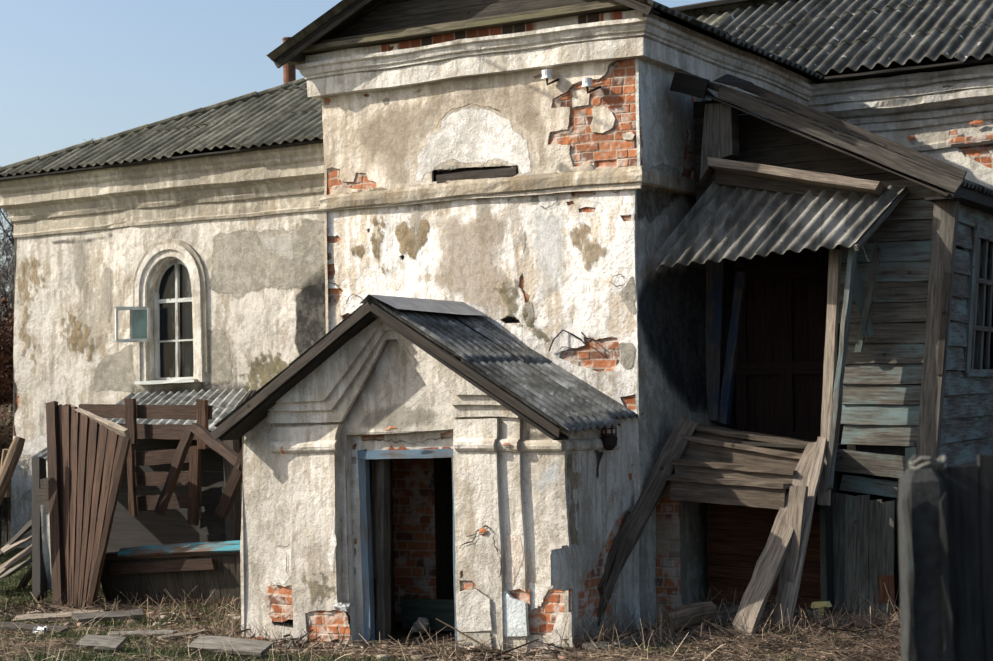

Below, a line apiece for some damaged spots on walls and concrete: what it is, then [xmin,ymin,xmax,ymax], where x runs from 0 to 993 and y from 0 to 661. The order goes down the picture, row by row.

flaking render [548,59,643,169]
flaking render [946,120,993,169]
flaking render [327,167,376,195]
damp [351,204,429,274]
damp [435,198,510,308]
damp [16,258,46,362]
damp [60,313,94,361]
flaking render [560,337,620,372]
peeling [118,610,240,631]
flaking render [265,511,744,661]